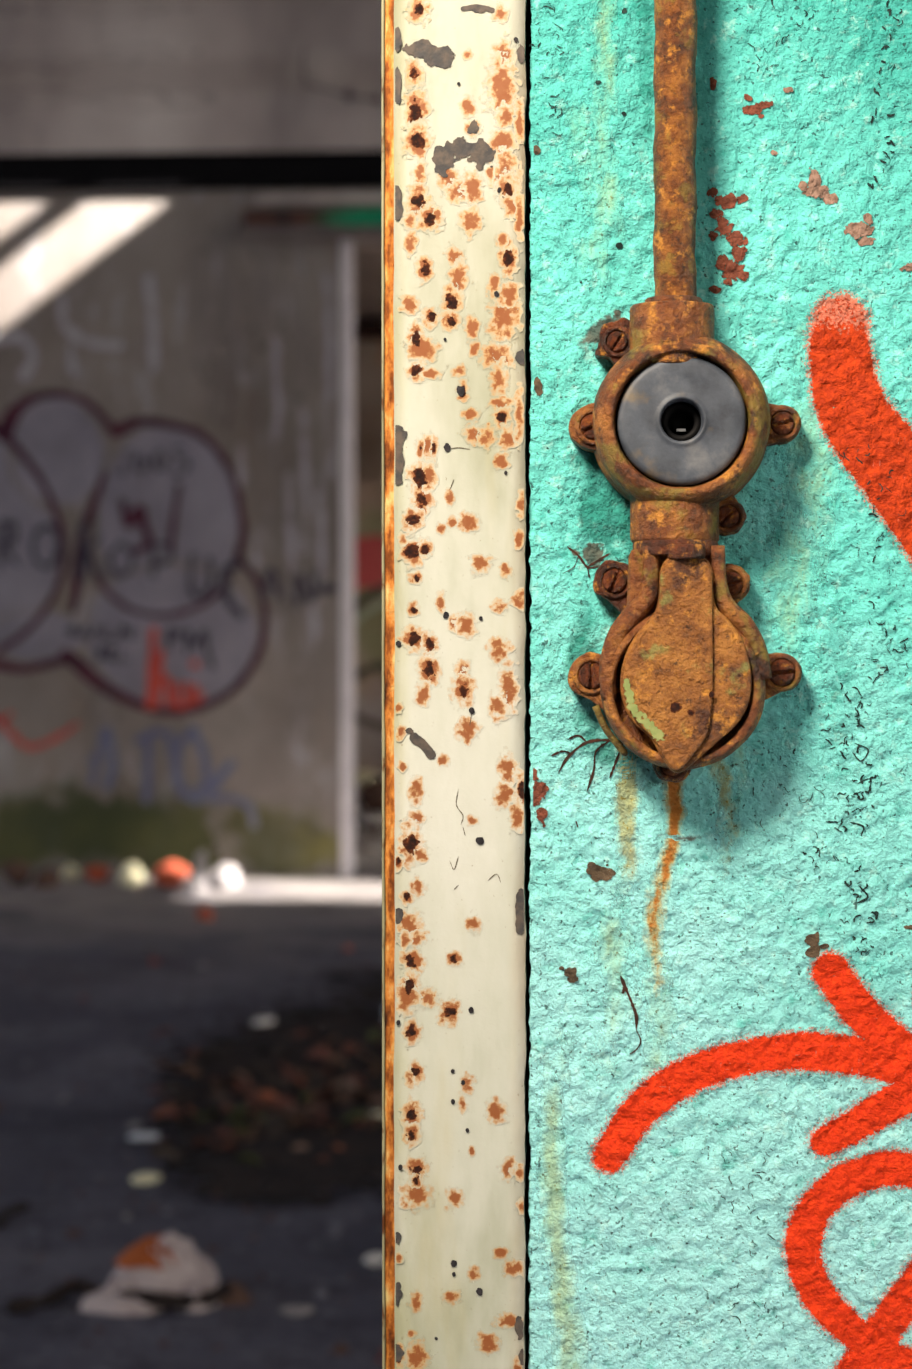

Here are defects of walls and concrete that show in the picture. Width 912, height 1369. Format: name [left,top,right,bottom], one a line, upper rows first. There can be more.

peeling [395,27,455,104]
peeling [395,185,403,220]
rust [397,0,524,473]
peeling [432,120,496,178]
peeling [707,187,749,294]
peeling [798,167,838,204]
peeling [844,213,875,246]
rust [395,429,524,767]
rust [491,746,524,835]
rust [590,738,751,1083]
rust [396,759,466,1215]
rust [396,1246,524,1369]